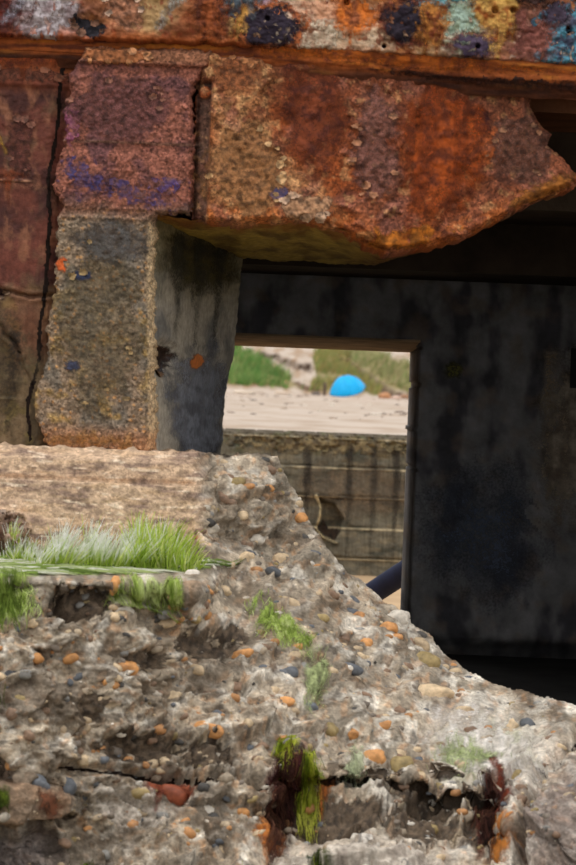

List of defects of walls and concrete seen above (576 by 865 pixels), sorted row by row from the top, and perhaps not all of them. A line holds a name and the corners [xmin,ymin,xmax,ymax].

rust [0,0,34,38]
rust [188,0,255,44]
rust [256,0,576,250]
crack [58,766,219,786]
crack [313,775,375,788]